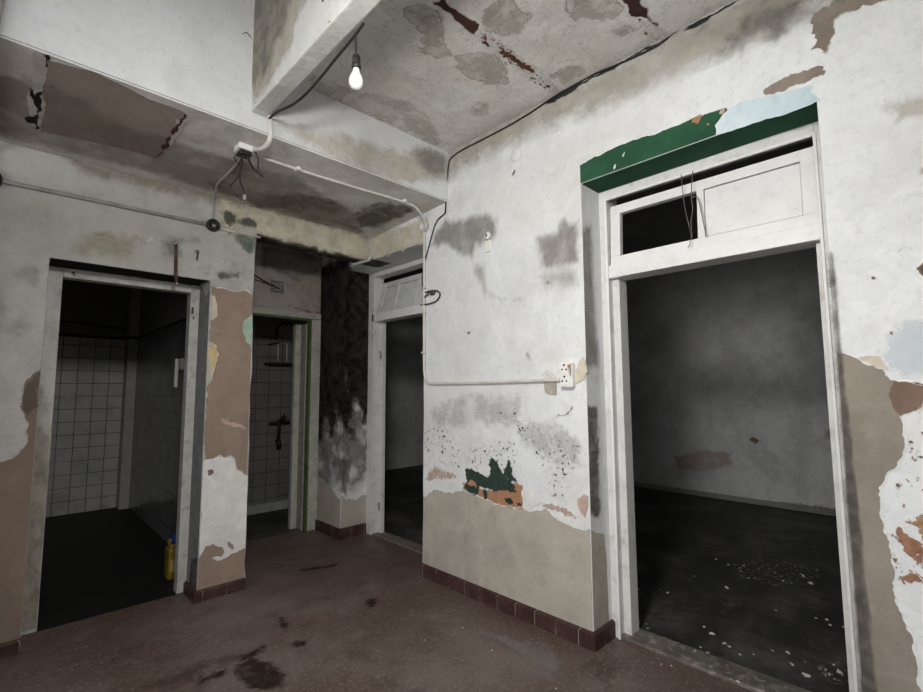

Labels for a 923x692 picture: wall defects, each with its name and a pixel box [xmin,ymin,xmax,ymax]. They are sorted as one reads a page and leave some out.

spalling [24,51,190,159]
crack [547,0,738,104]
peeling [762,66,827,96]
peeling [810,0,887,54]
water stain [0,77,423,492]
water stain [435,217,494,254]
flaking render [913,259,923,282]
peeling [204,286,253,475]
water stain [21,502,45,632]
peeling [197,541,245,590]
peeling [423,468,593,632]
peeling [840,353,923,692]